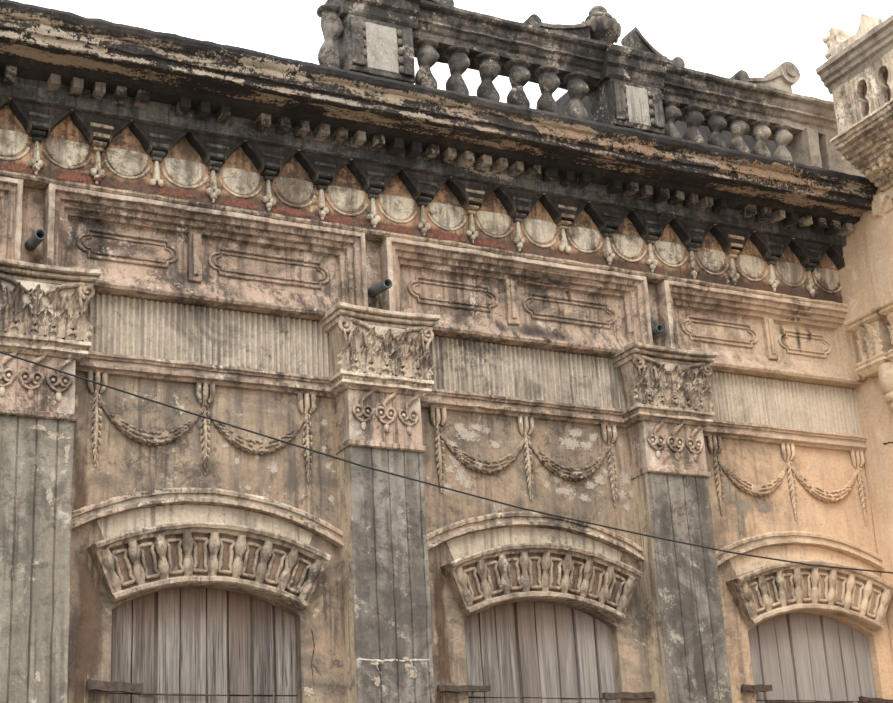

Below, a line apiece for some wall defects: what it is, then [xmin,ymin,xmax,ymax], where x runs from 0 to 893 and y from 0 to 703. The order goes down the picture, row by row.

peeling [0,23,156,65]
peeling [171,66,245,86]
peeling [238,56,307,82]
peeling [311,92,361,107]
peeling [399,110,445,123]
peeling [536,123,677,162]
peeling [454,153,513,180]
peeling [706,155,835,195]